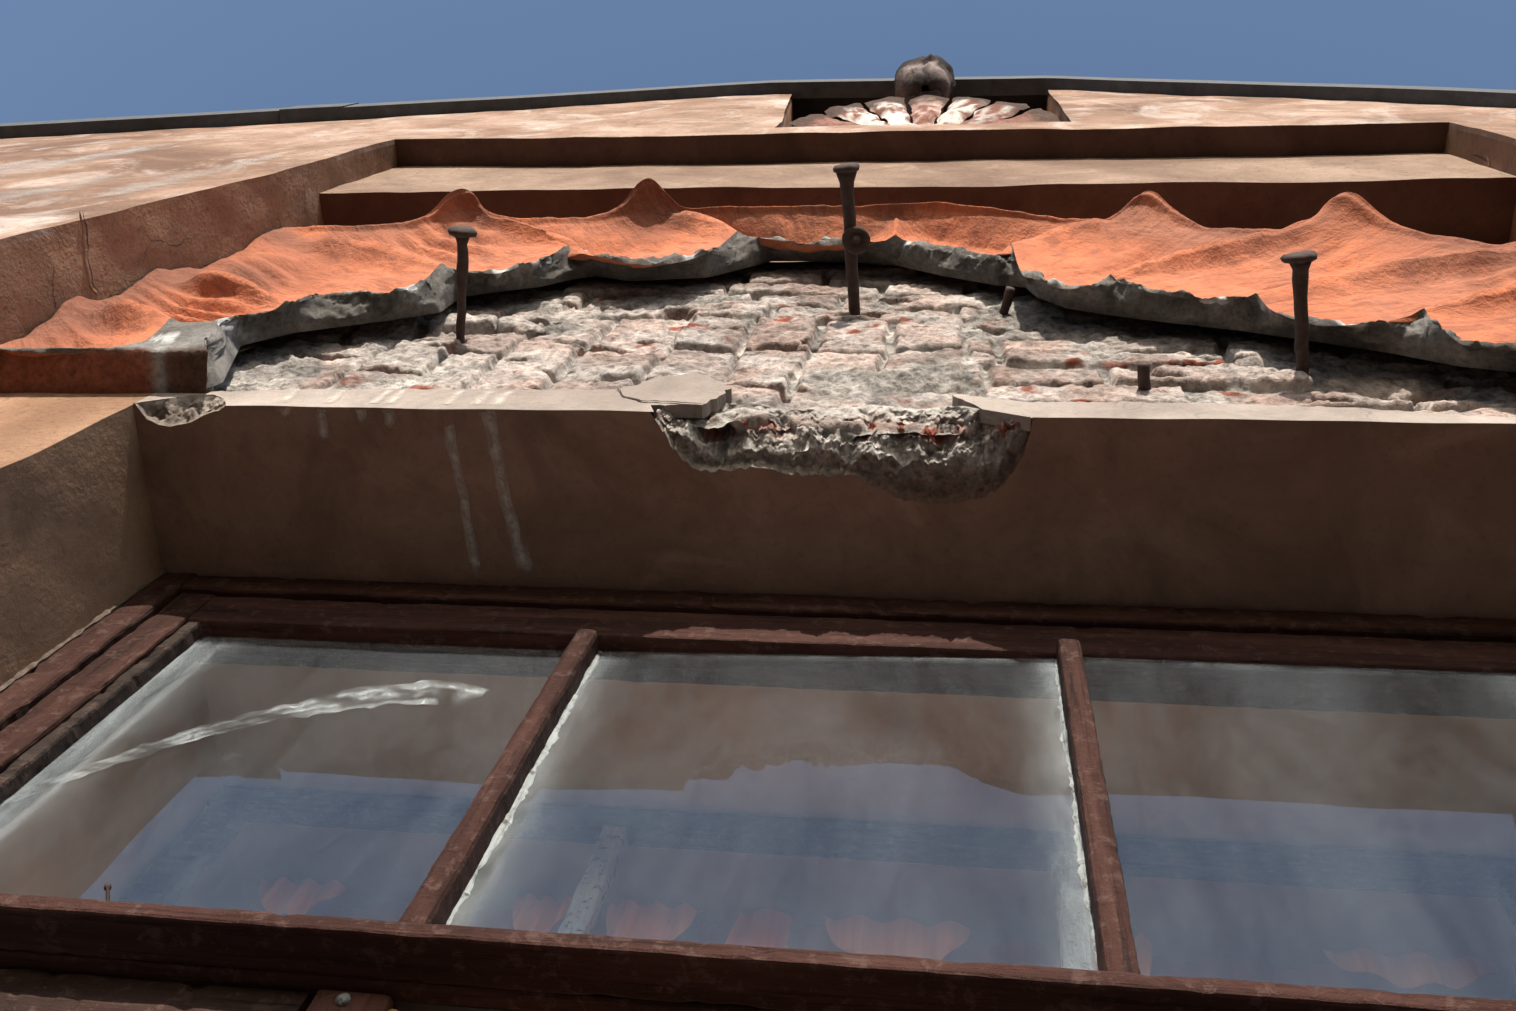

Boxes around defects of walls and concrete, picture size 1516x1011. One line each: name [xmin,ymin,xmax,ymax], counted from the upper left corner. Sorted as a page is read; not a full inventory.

spalling [0,231,1516,427]
flaking render [617,388,1030,504]